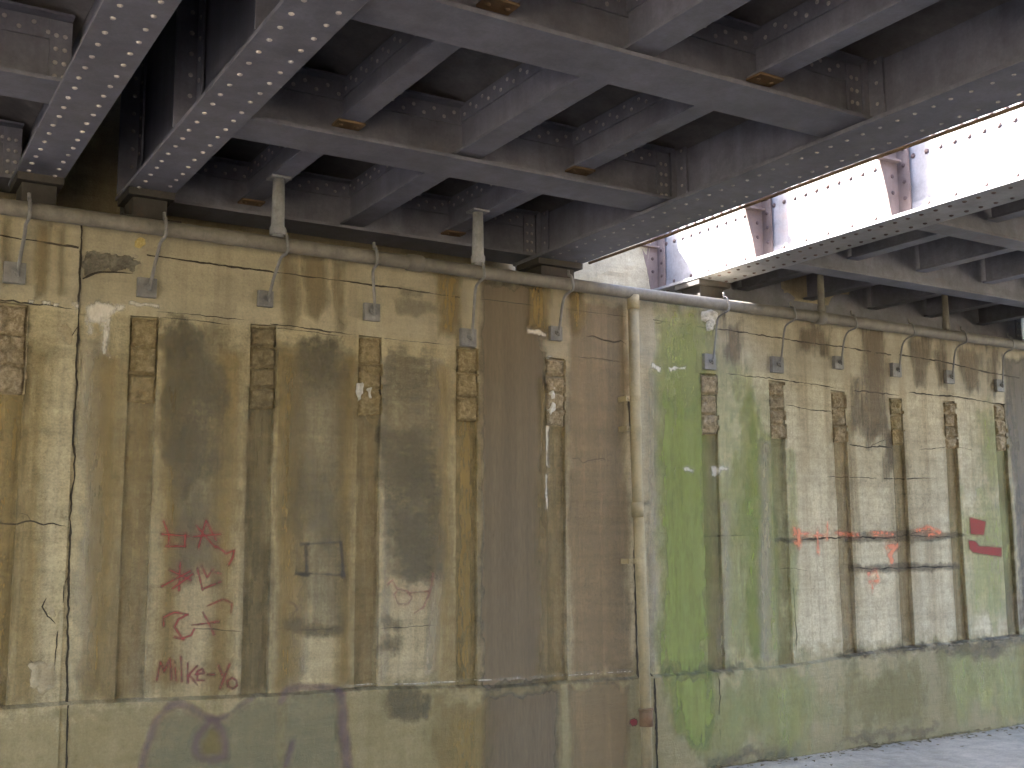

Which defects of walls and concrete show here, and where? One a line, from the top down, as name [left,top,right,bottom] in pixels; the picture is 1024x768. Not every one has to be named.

spalling [81,250,141,279]
crack [147,254,529,305]
crack [730,374,833,412]
damp [800,323,830,356]
damp [911,337,945,385]
crack [859,390,1011,405]
damp [959,349,979,392]
crack [849,440,893,450]
crack [0,225,83,768]
damp [212,350,342,690]
damp [684,435,728,667]
damp [761,443,770,657]